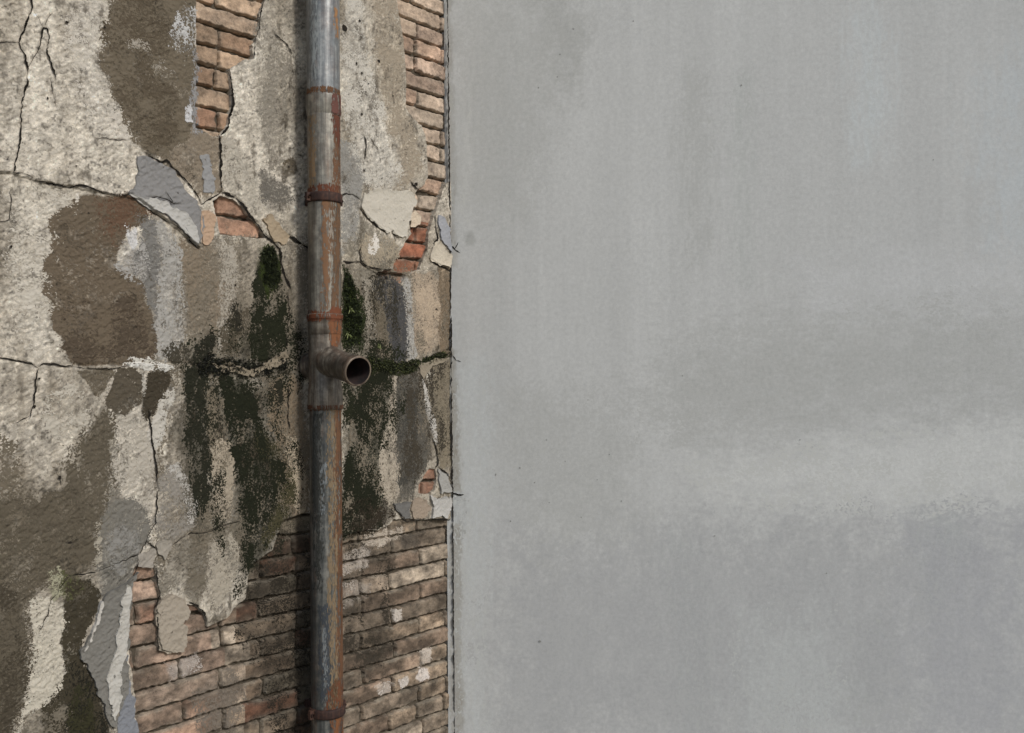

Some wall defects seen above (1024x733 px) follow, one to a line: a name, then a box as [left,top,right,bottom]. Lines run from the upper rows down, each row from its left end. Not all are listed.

crack [0,0,308,346]
flaking render [128,154,290,245]
spalling [195,0,263,137]
rust [306,85,343,347]
spalling [360,0,453,283]
crack [0,357,128,424]
damp [0,0,498,733]
crack [39,412,240,650]
spalling [79,513,311,733]
rust [307,404,344,733]
spalling [342,469,453,733]